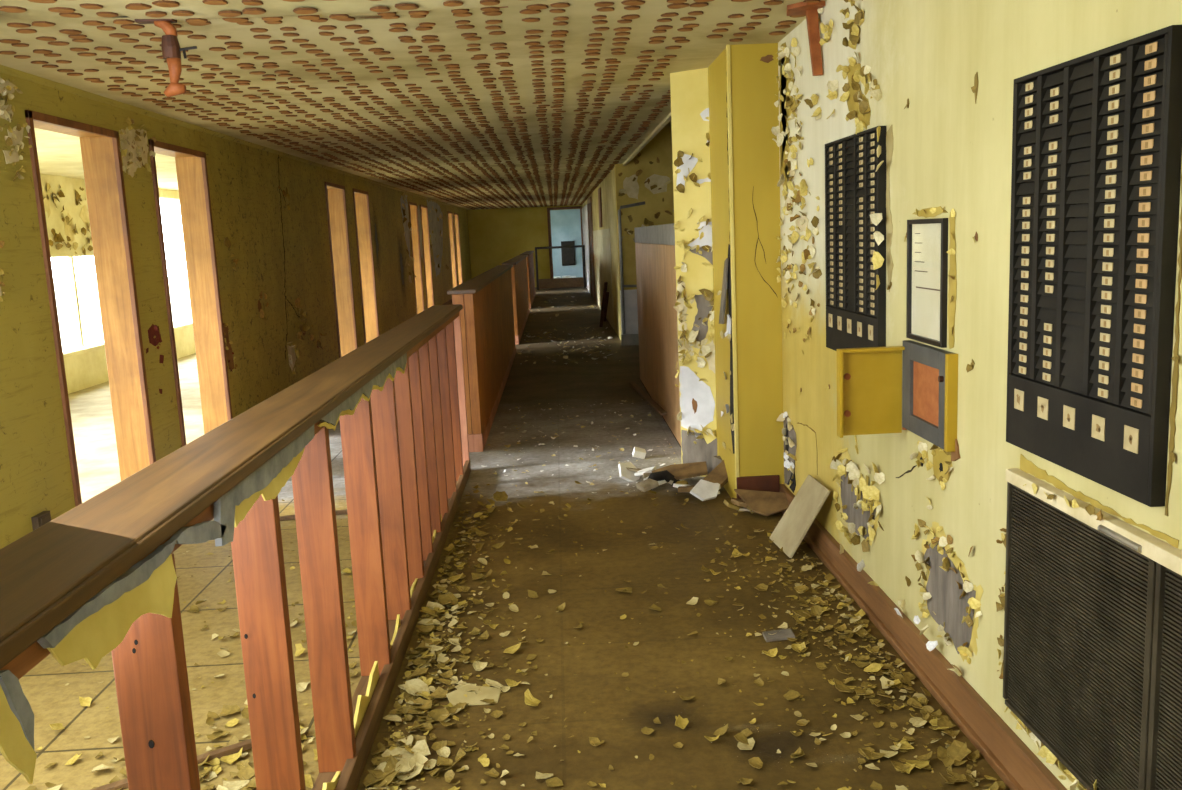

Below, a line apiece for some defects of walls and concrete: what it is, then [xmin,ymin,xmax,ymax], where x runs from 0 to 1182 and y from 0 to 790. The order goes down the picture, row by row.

peeling [0,78,32,182]
peeling [119,117,156,177]
peeling [760,0,907,354]
spalling [372,108,735,790]
peeling [909,439,961,490]
spalling [830,435,885,586]
peeling [182,600,240,657]
peeling [288,589,307,657]
peeling [642,496,997,790]
peeling [996,571,1005,612]
peeling [194,717,255,789]